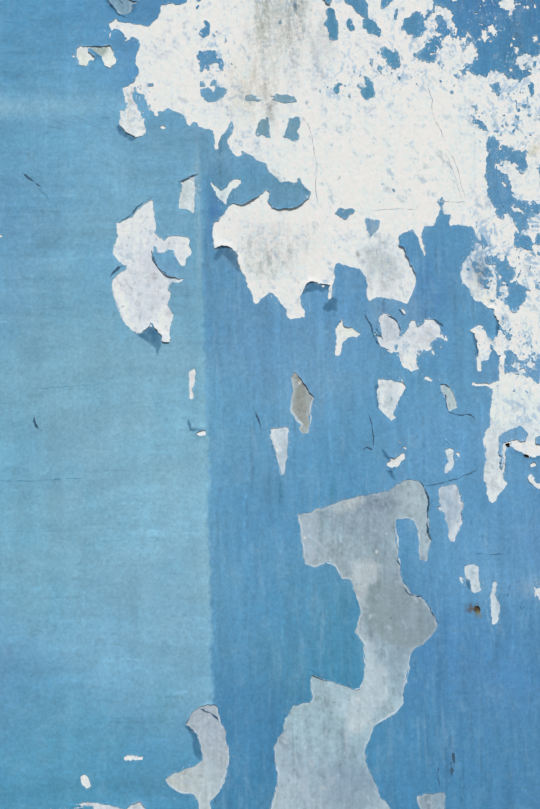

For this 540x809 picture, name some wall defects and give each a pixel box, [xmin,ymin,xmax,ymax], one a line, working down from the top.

peeling [73,0,540,503]
peeling [75,801,145,809]
peeling [165,704,229,809]
peeling [271,479,464,809]